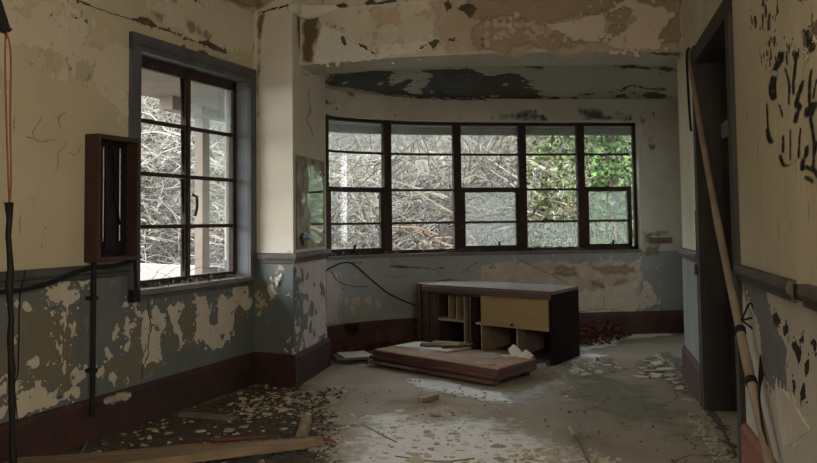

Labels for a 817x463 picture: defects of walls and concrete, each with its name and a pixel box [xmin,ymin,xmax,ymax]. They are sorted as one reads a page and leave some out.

peeling [0,0,129,127]
peeling [133,0,254,60]
spalling [312,0,594,99]
peeling [414,0,682,74]
crack [383,260,485,277]
peeling [477,254,665,313]
peeling [0,248,381,419]
peeling [741,283,817,458]